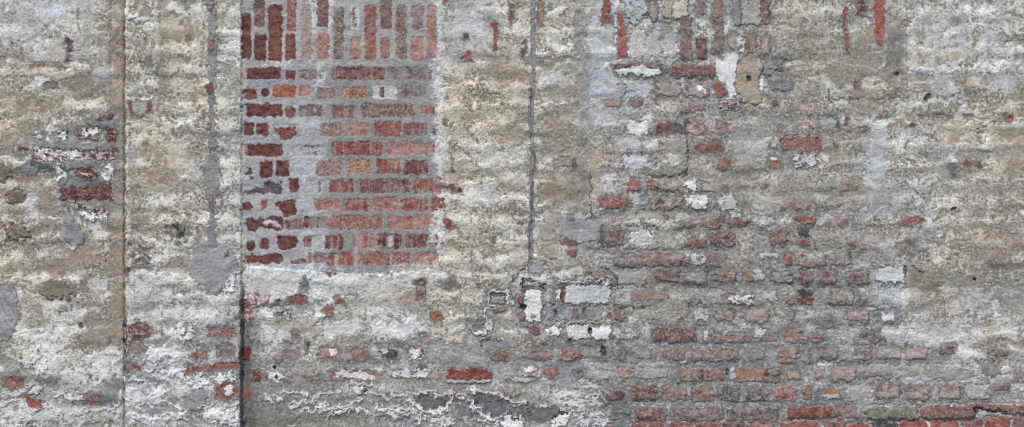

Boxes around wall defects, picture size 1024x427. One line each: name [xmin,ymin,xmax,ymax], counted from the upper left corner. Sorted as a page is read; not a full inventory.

peeling [12,108,121,226]
peeling [439,182,463,194]
peeling [442,218,460,232]
crack [511,0,547,293]
spalling [445,0,1024,427]
peeling [122,317,158,378]
peeling [174,321,243,402]